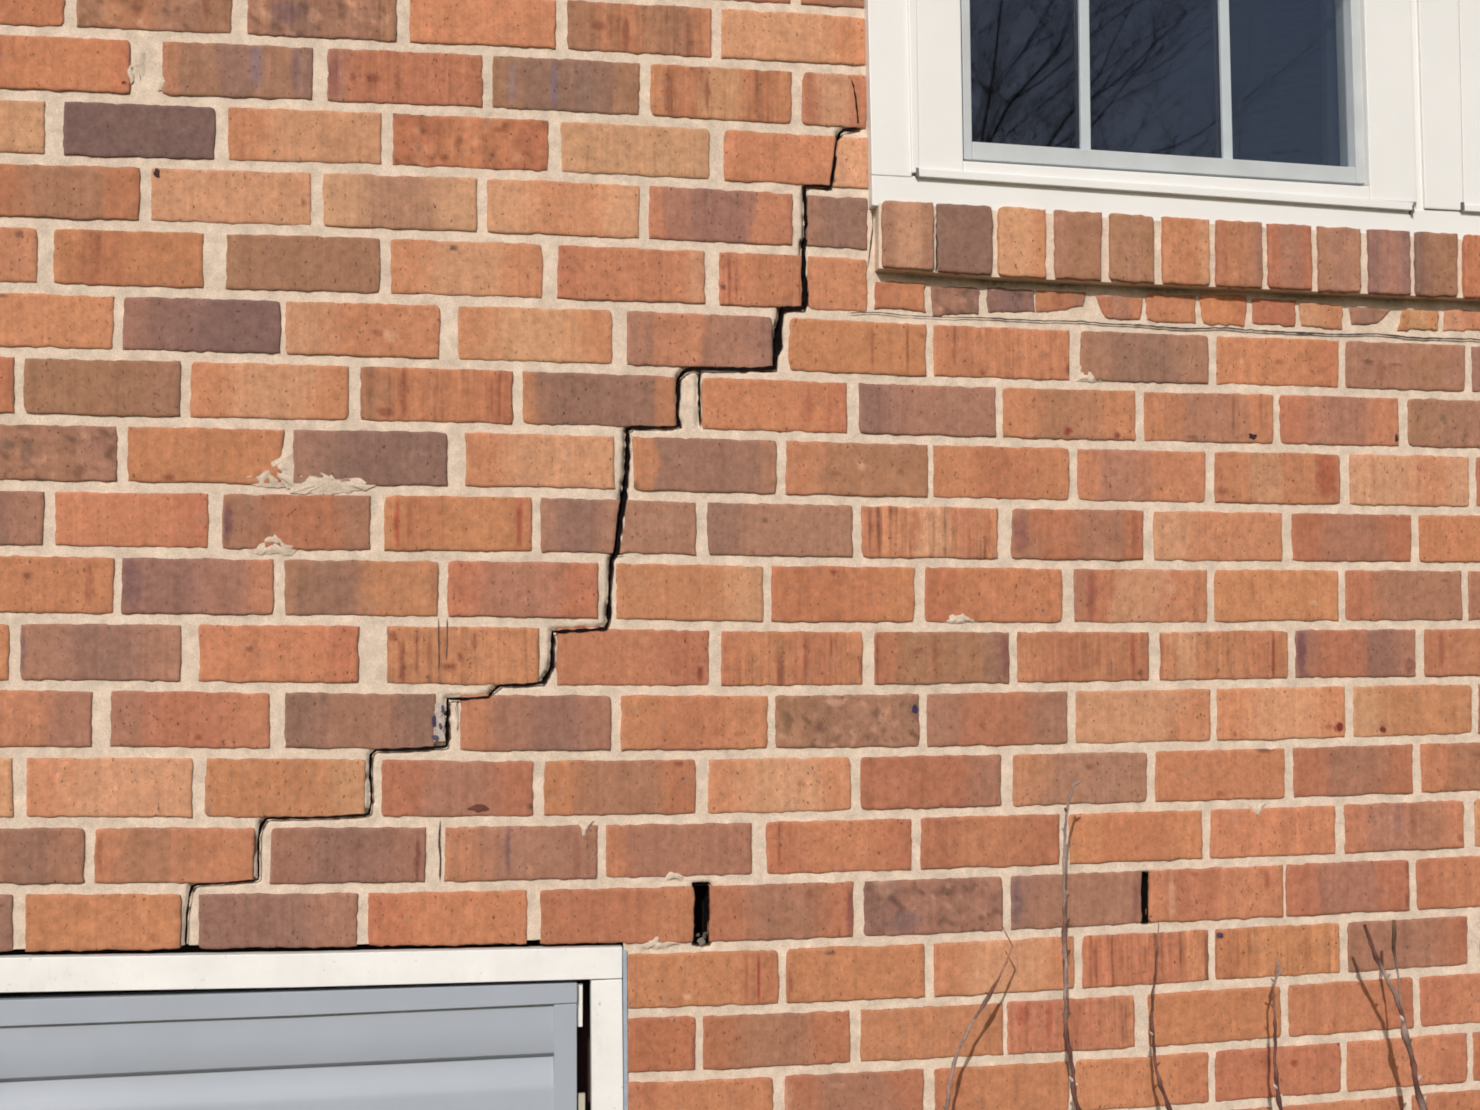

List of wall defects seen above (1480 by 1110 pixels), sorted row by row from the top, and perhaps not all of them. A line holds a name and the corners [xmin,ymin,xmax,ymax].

crack [185,79,860,949]